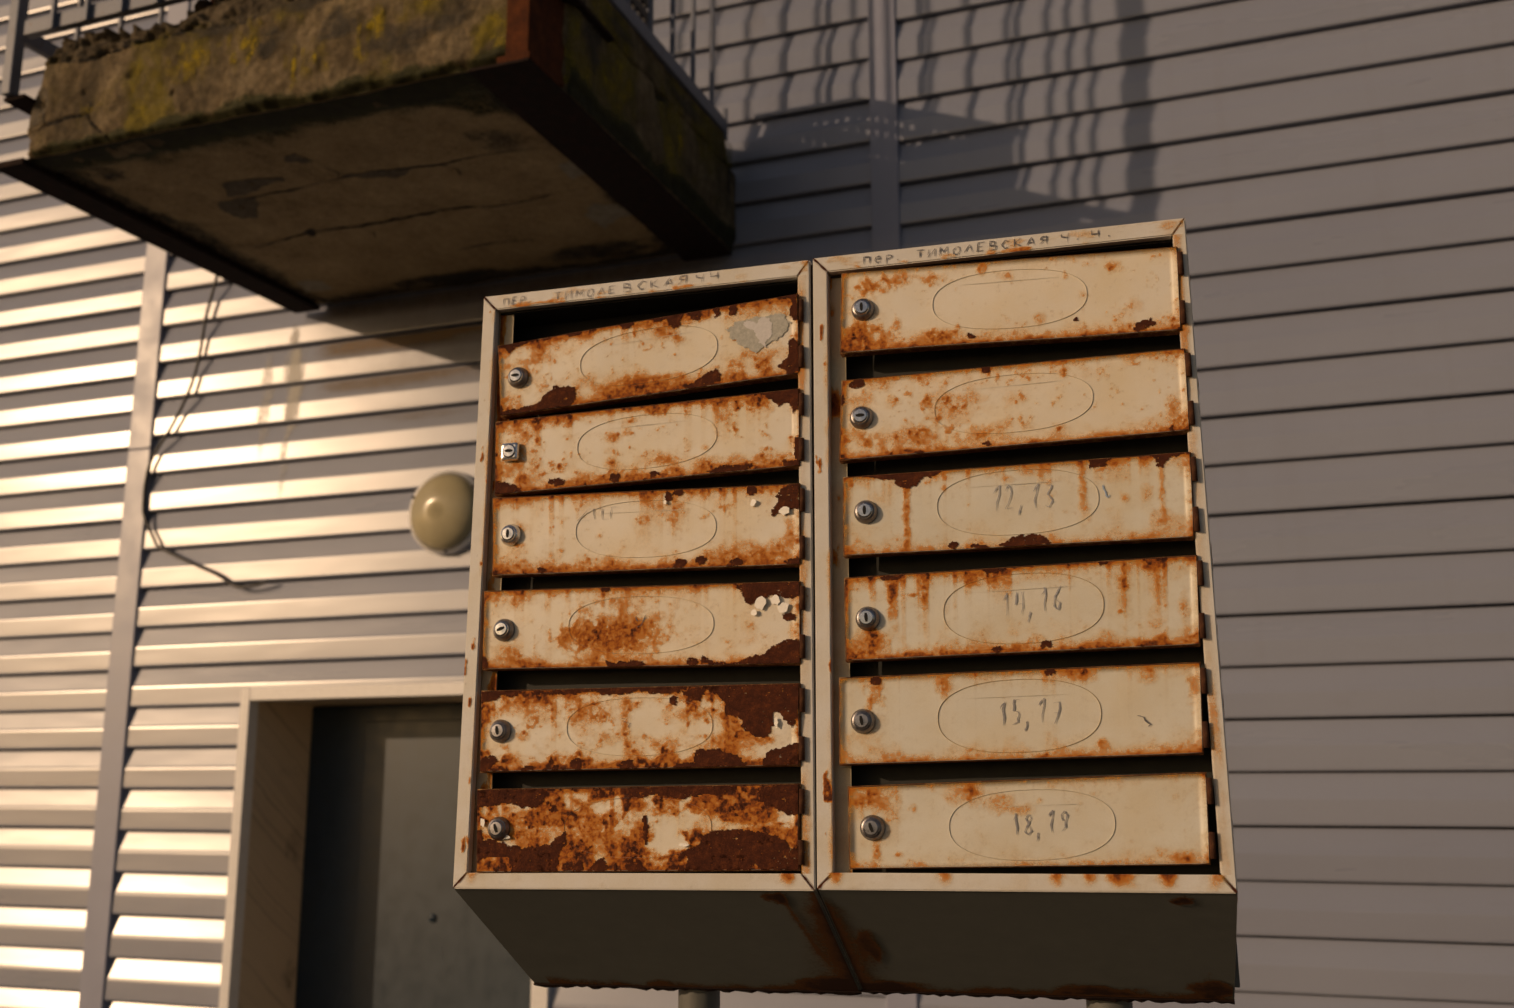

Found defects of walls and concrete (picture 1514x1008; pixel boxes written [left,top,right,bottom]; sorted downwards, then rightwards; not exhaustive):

water stain [151,0,468,81]
crack [235,148,549,248]